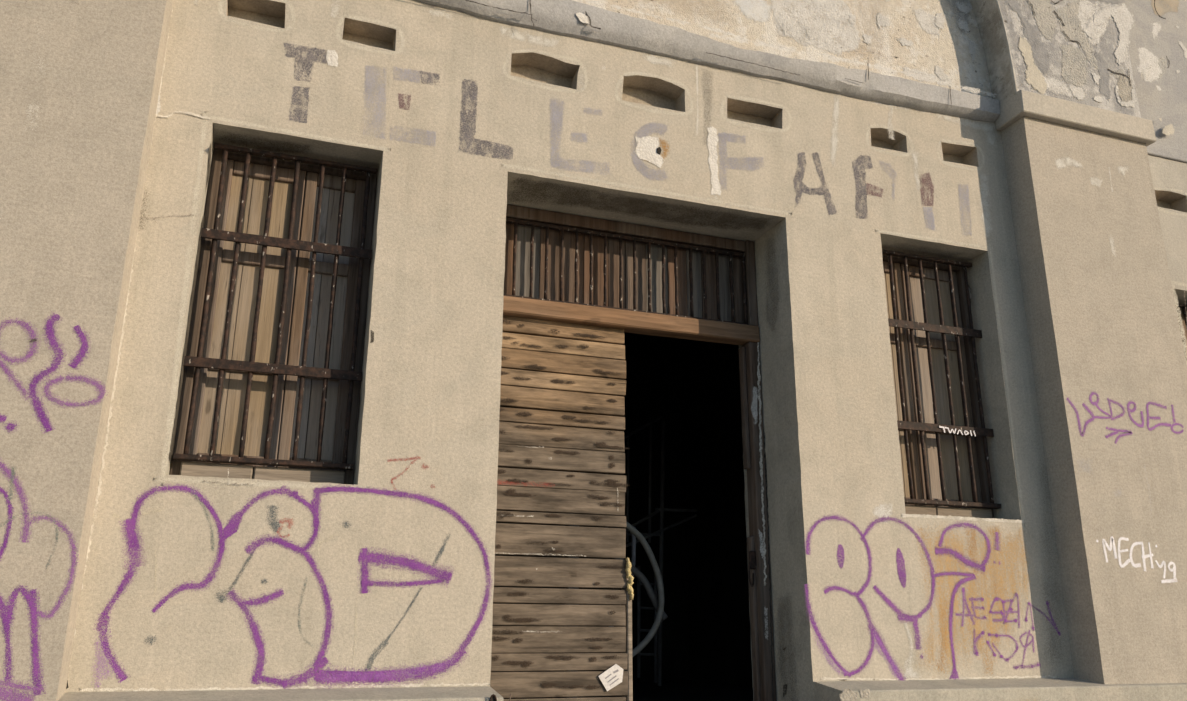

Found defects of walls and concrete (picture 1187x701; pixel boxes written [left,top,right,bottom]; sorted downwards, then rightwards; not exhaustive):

peeling [576,0,997,97]
peeling [1006,0,1162,107]
rust [911,522,1030,678]